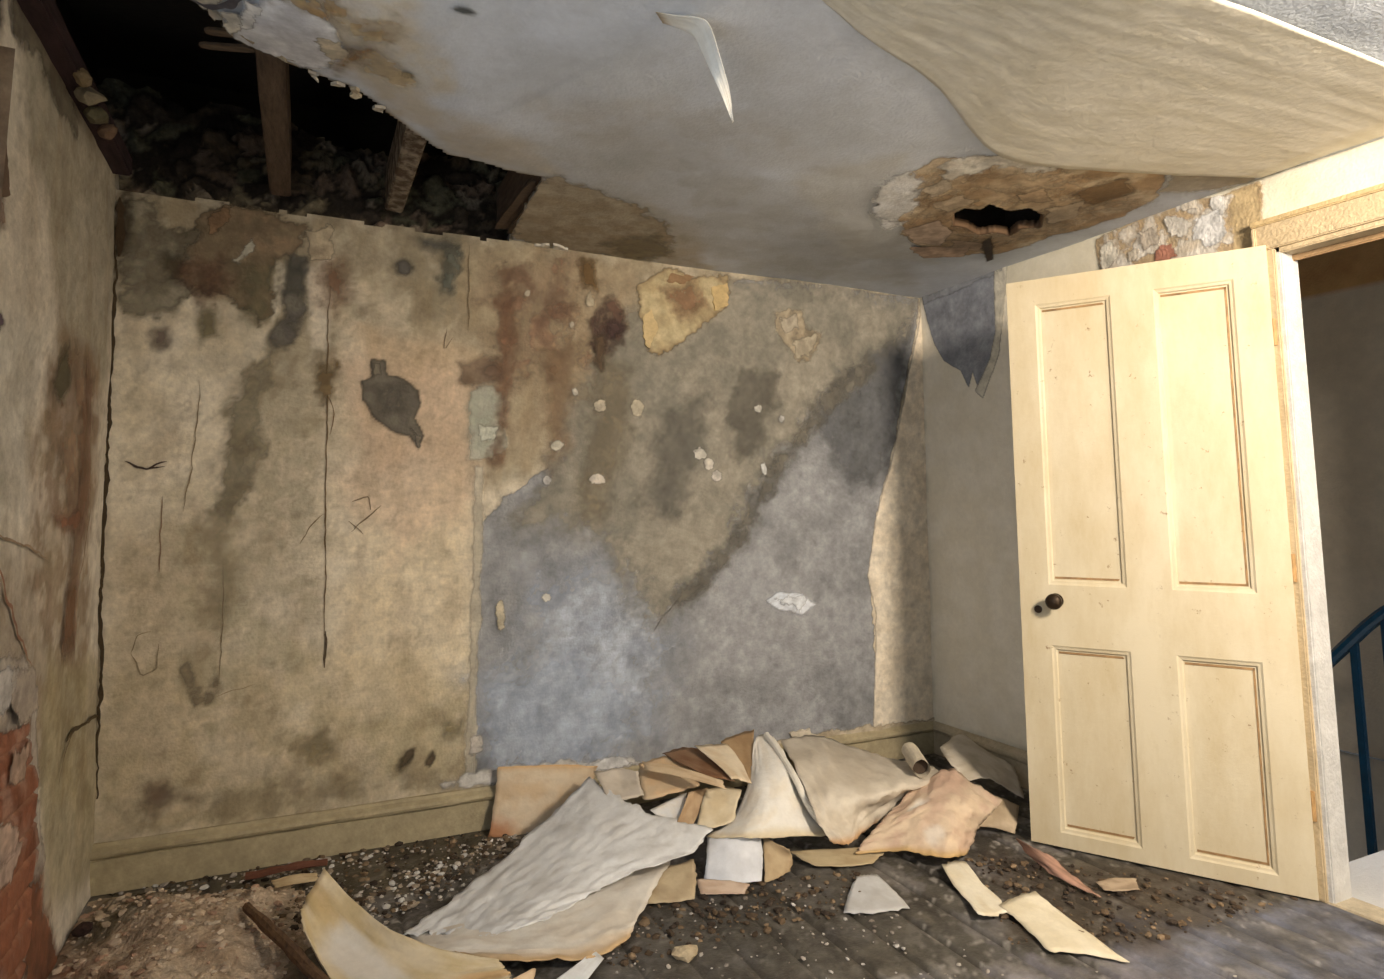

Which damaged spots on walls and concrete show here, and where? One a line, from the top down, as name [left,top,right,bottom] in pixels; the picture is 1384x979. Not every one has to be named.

peeling [191,0,386,113]
crack [58,197,256,799]
damp [114,185,201,347]
spalling [172,203,335,327]
damp [215,255,308,522]
crack [300,264,335,668]
damp [512,177,675,261]
peeling [637,268,731,356]
damp [518,277,920,618]
spalling [871,155,1263,270]
crack [0,534,48,666]
spalling [0,655,57,979]